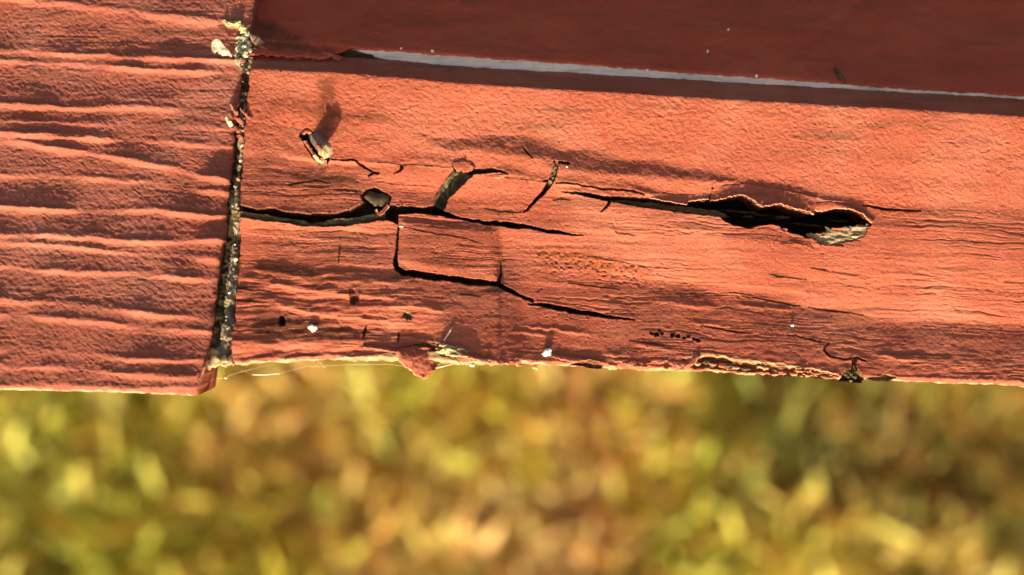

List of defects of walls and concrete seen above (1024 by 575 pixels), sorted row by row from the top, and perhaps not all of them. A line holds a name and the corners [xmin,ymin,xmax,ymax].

crack [231,148,665,346]
crack [863,204,921,212]